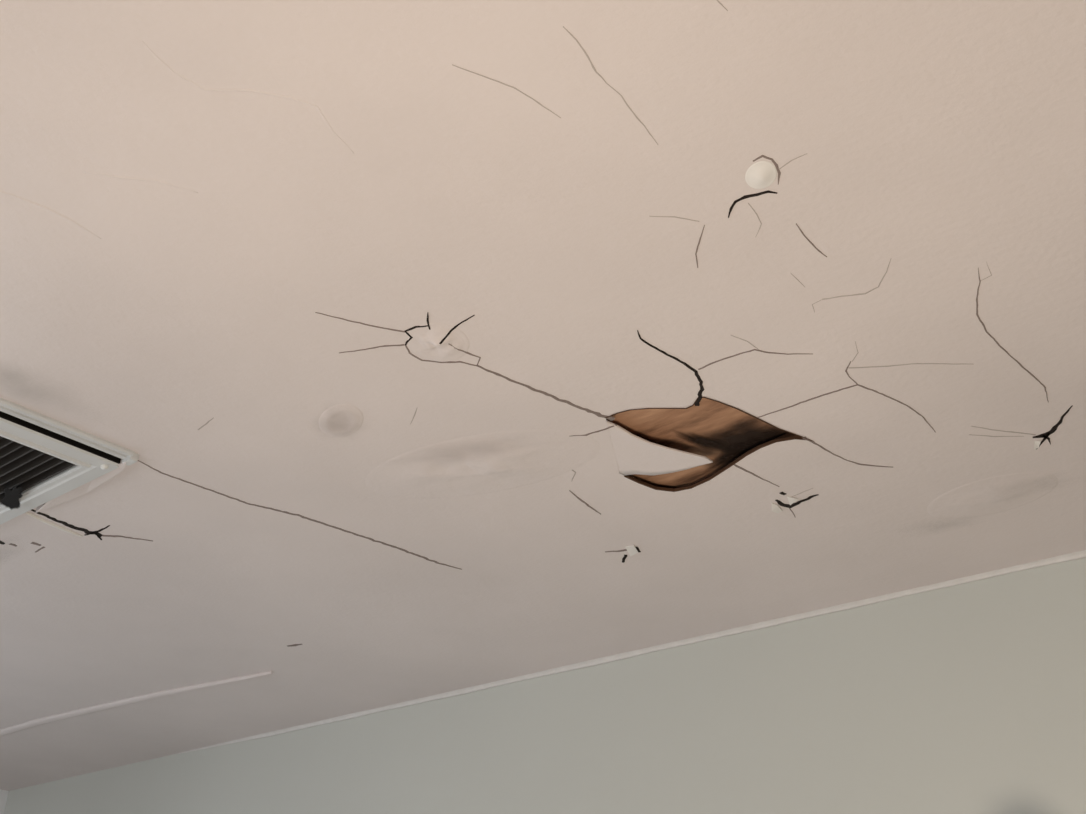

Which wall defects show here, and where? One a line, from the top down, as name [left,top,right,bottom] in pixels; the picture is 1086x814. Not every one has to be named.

crack [453,65,561,118]
crack [563,26,658,145]
crack [650,216,705,268]
crack [796,223,827,257]
crack [795,259,891,313]
crack [315,312,617,436]
crack [637,330,801,406]
crack [758,342,947,433]
crack [976,262,1049,402]
crack [802,436,889,467]
crack [25,509,152,541]
crack [138,460,462,570]